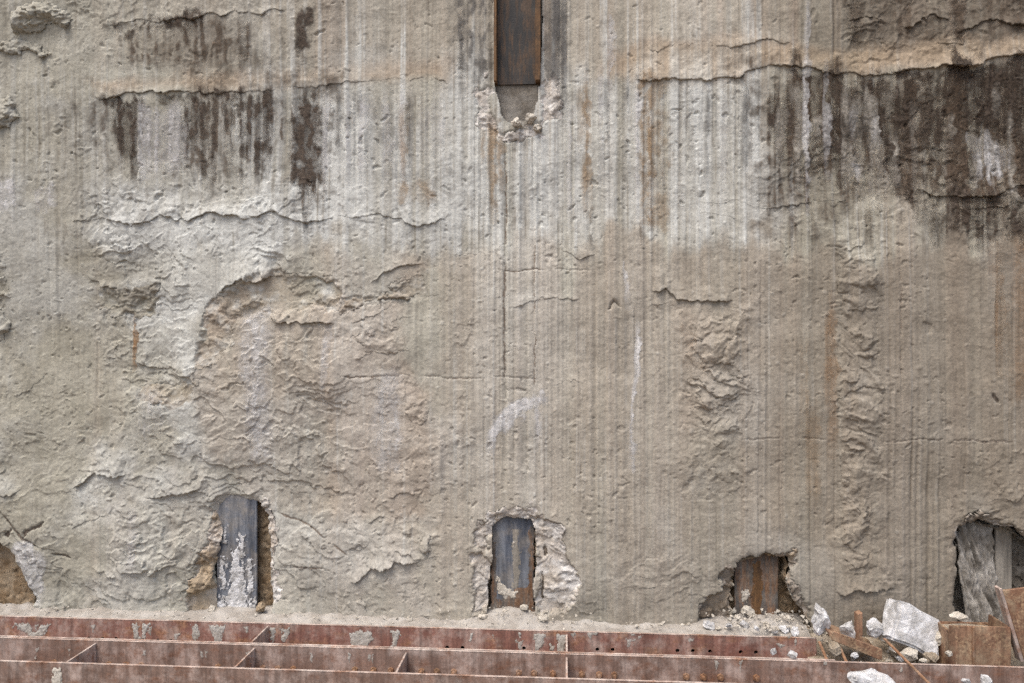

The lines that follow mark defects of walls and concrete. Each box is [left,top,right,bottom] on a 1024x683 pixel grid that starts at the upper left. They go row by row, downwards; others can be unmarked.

peeling [633,0,1024,82]
damp [90,78,337,207]
spalling [467,72,564,144]
damp [743,49,1024,239]
peeling [139,464,289,612]
spalling [468,501,582,615]
spalling [698,564,735,619]
spalling [776,549,814,618]